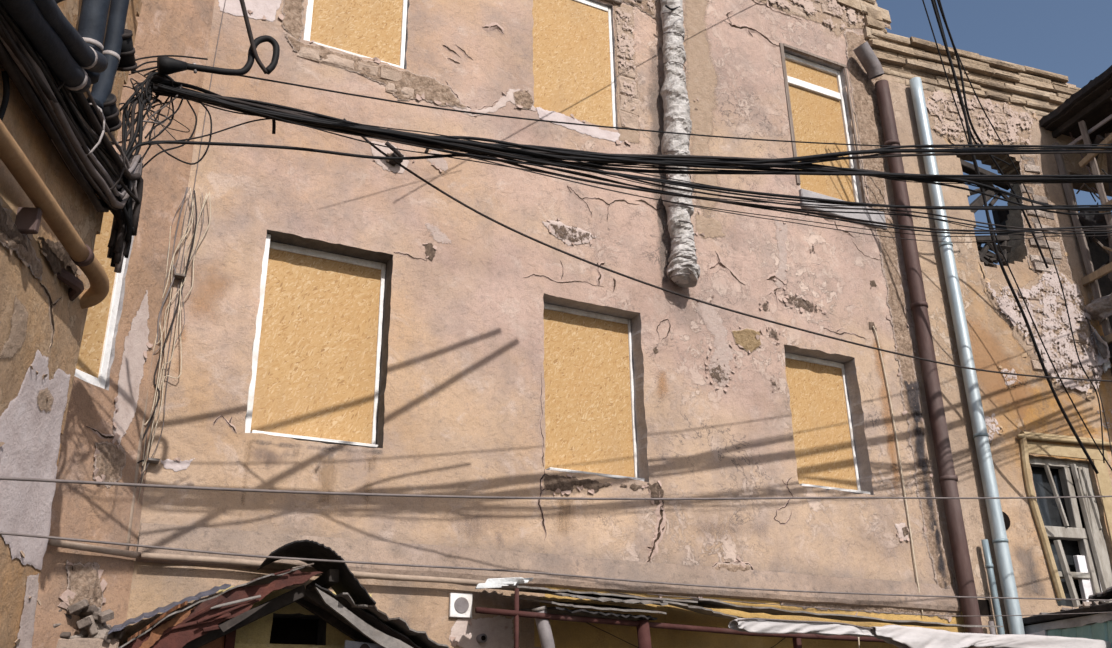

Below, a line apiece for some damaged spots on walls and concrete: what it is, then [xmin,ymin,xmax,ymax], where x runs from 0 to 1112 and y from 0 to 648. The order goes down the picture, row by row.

spalling [218,0,656,145]
peeling [684,0,725,239]
peeling [93,289,153,488]
crack [523,260,616,292]
spalling [543,217,597,246]
crack [566,185,660,222]
peeling [696,295,782,392]
spalling [757,0,955,588]
spalling [924,90,1112,428]
peeling [0,350,70,648]
spalling [58,560,108,614]
crack [646,487,666,562]